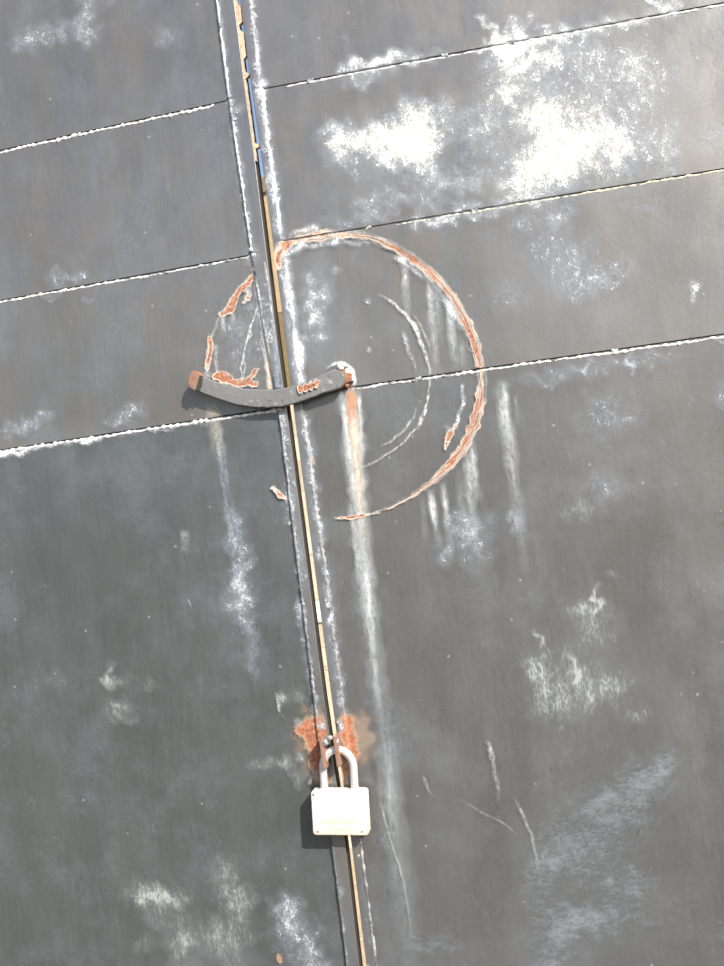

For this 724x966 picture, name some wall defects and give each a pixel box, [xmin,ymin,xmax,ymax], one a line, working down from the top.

leakage [337,49,422,88]
leakage [323,98,463,205]
leakage [410,15,679,231]
corrosion [274,225,486,520]
leakage [343,393,364,532]
leakage [228,511,253,633]
leakage [429,500,483,562]
leakage [567,587,605,643]
leakage [528,634,626,714]
corrosion [294,703,374,785]
leakage [135,883,188,912]
leakage [276,895,320,966]